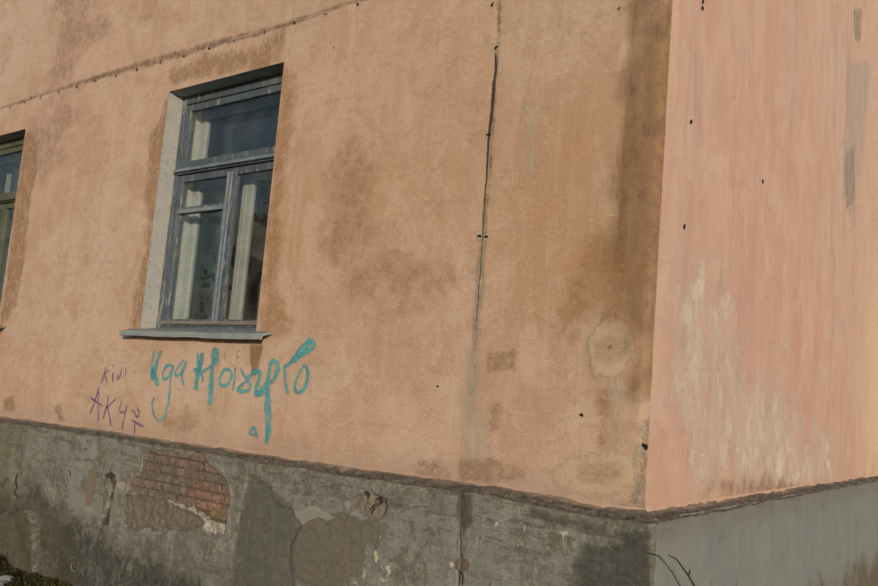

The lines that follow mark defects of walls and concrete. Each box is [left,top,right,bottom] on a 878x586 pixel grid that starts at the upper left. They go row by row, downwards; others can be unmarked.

water stain [571,0,673,391]
flaking render [103,447,231,537]
crack [458,493,471,586]